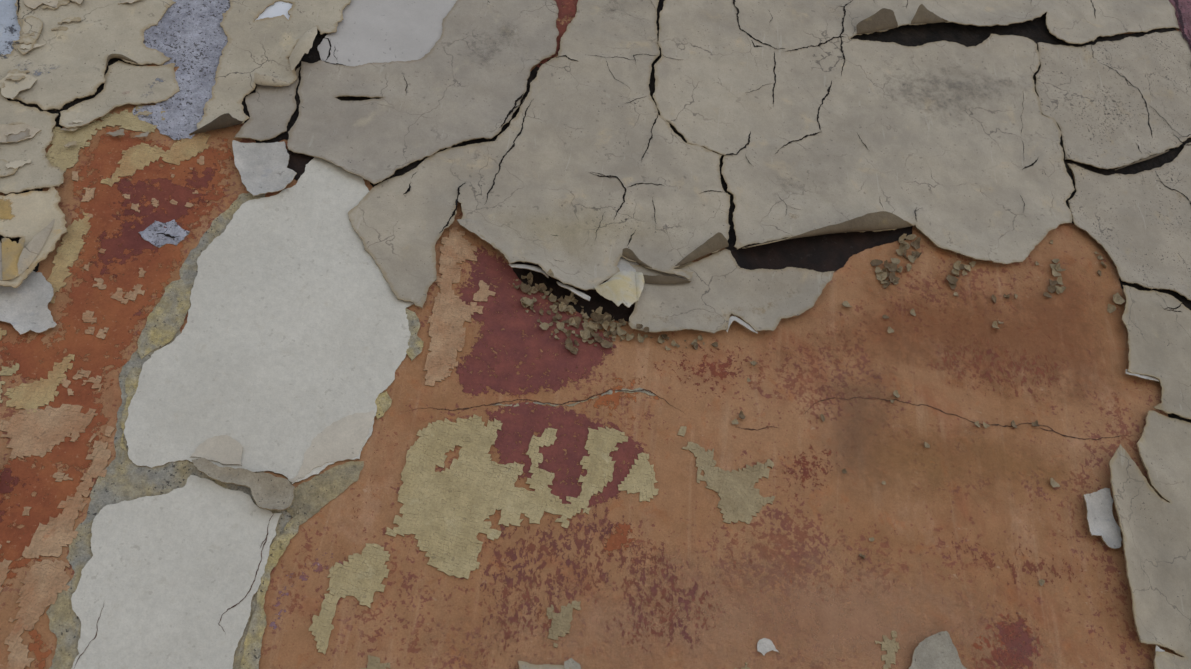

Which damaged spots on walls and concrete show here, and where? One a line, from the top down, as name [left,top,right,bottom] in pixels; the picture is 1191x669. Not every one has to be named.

corrosion [0,127,234,588]
flaking render [0,0,559,669]
crack [281,34,346,140]
crack [370,0,853,251]
peeling [348,0,1191,387]
crack [1020,42,1117,224]
crack [1091,0,1191,204]
peeling [1113,285,1191,419]
crack [1119,278,1191,312]
peeling [309,387,659,655]
peeling [874,631,966,669]
peeling [1083,411,1191,669]